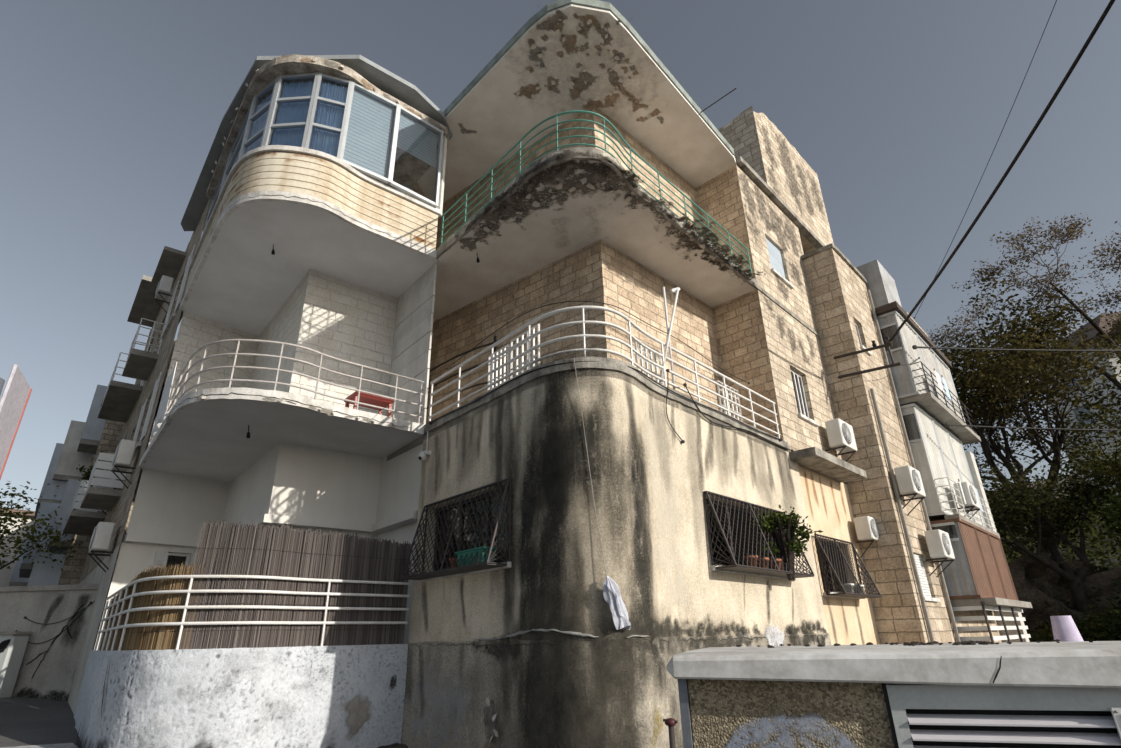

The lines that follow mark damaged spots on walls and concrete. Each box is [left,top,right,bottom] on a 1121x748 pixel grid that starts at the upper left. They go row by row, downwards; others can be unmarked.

peeling [515,10,663,124]
spalling [447,219,477,252]
leakage [465,129,823,299]
leakage [766,299,815,362]
leakage [473,351,760,748]
leakage [786,604,865,646]
crack [993,656,1002,683]
leakage [345,695,370,736]